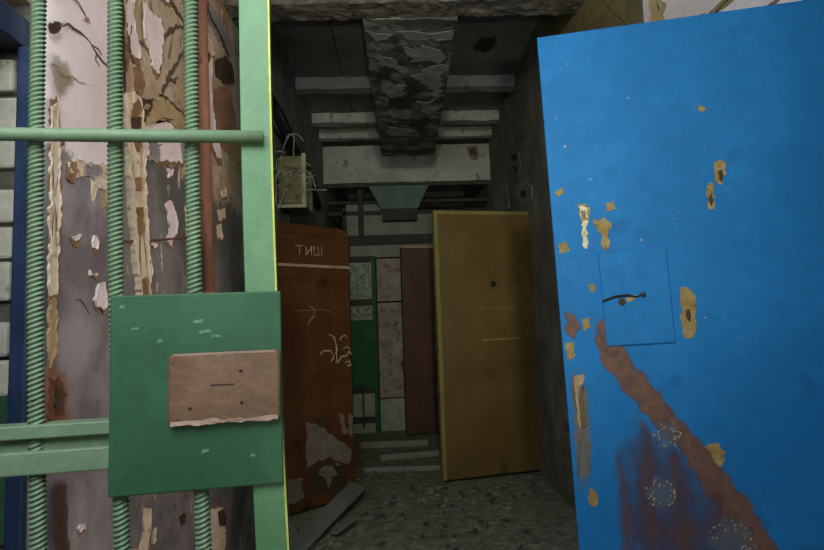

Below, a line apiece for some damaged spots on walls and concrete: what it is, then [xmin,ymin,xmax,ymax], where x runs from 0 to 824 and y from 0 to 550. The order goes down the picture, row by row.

crack [58,0,130,92]
peeling [122,0,186,130]
flaking render [207,0,239,130]
spalling [271,0,584,22]
crack [701,0,734,15]
peeling [46,142,109,371]
peeling [123,142,187,295]
peeling [577,200,616,251]
rust [565,312,580,339]
peeling [680,287,697,339]
rust [44,365,69,421]
rust [595,320,778,550]